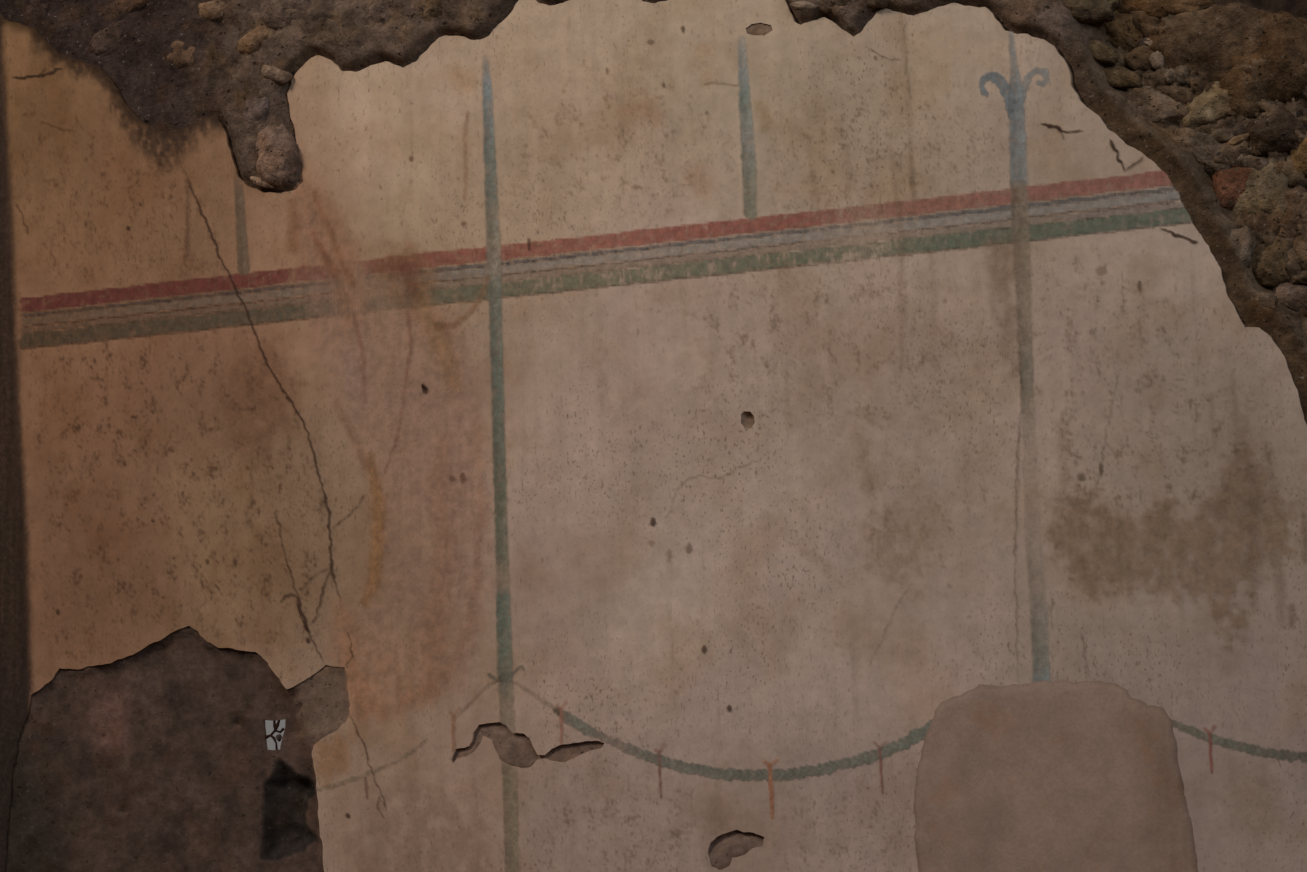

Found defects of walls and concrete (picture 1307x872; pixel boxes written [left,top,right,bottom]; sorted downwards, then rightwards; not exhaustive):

spalling [0,0,518,193]
spalling [746,23,772,36]
spalling [787,0,1307,424]
crack [189,185,336,653]
water stain [1050,442,1291,626]
spalling [6,626,350,872]
spalling [453,722,604,768]
spalling [709,830,764,870]